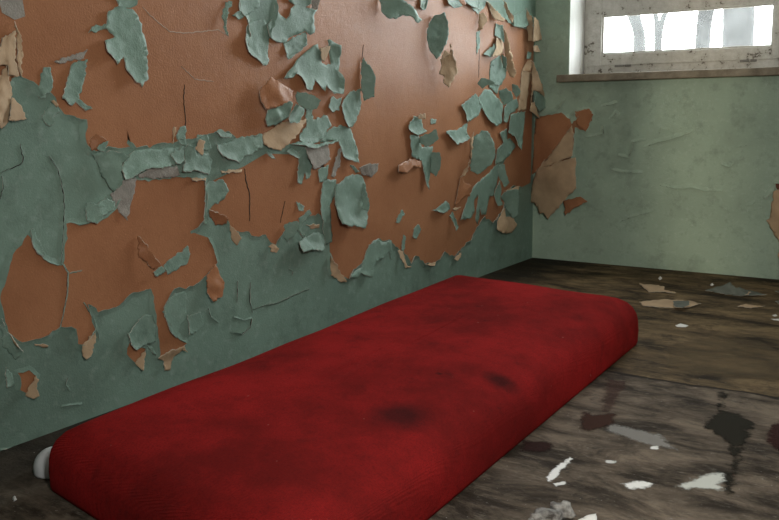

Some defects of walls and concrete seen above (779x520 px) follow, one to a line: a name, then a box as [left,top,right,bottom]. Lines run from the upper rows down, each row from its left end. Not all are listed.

peeling [0,0,595,399]
peeling [763,179,779,241]